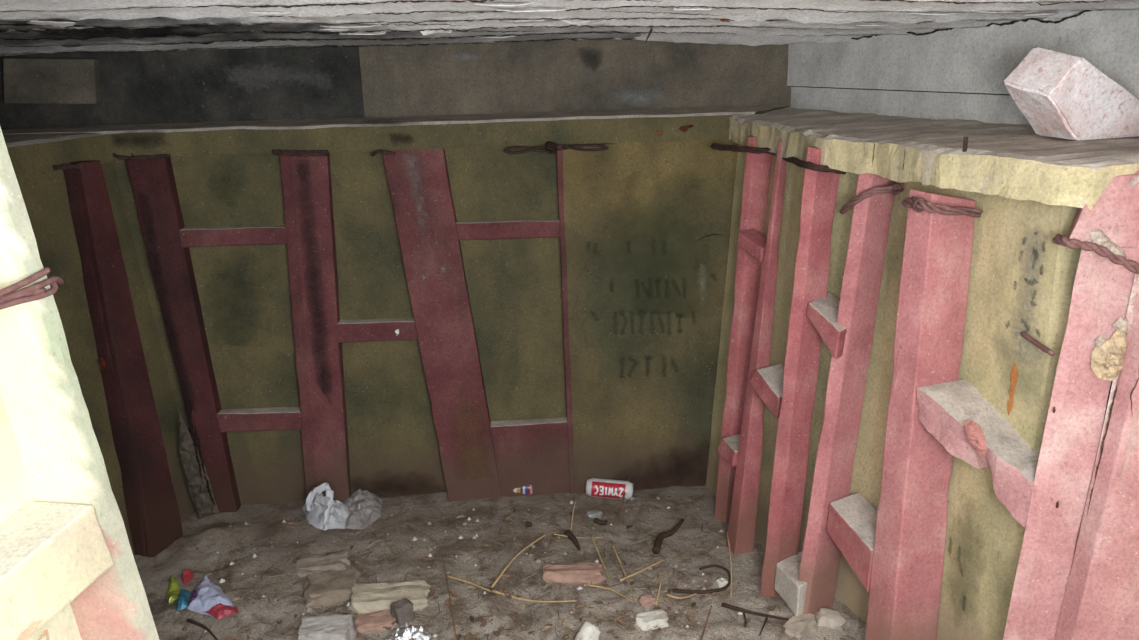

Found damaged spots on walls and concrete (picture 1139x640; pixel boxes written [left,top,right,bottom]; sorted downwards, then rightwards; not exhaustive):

crack [31,0,1107,48]
crack [1087,378,1139,514]